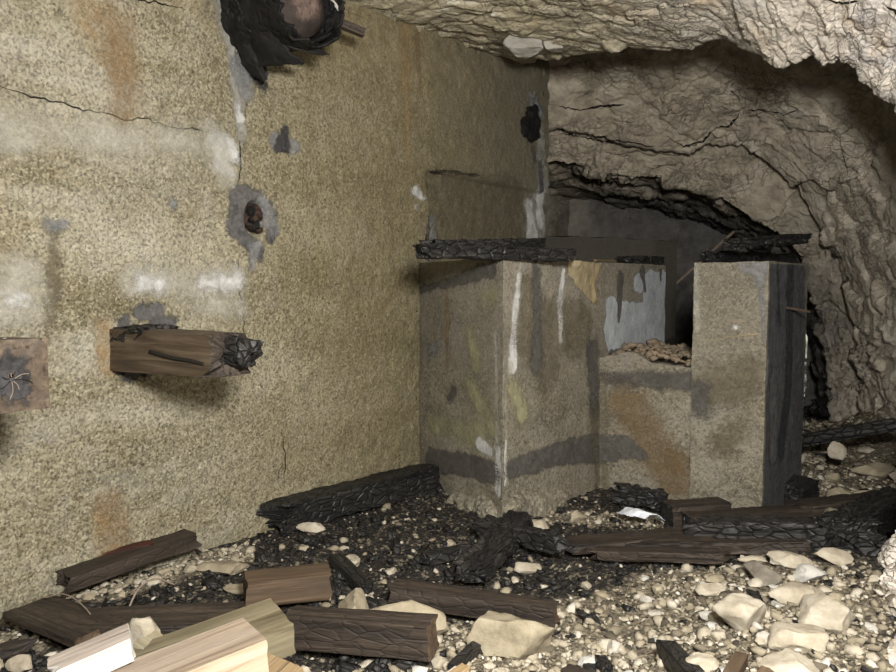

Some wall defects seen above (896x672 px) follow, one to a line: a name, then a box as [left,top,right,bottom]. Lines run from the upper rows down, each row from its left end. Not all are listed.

damp [420,260,764,497]